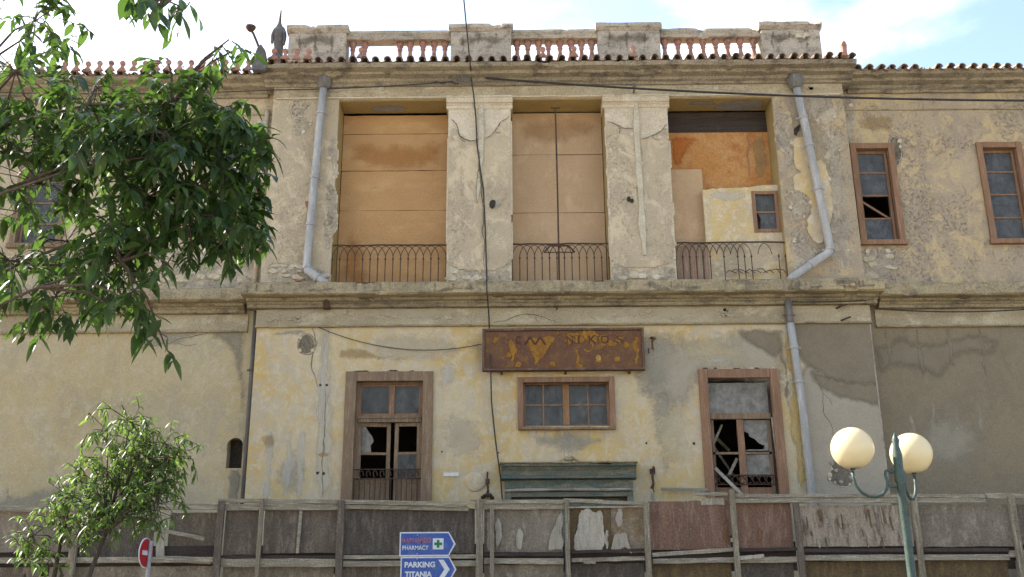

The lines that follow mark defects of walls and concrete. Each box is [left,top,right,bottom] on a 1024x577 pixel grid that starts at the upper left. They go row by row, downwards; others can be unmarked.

spalling [152,99,333,288]
spalling [324,137,339,249]
crack [451,106,509,267]
spalling [604,121,677,280]
spalling [709,94,899,290]
damp [639,324,891,506]
spalling [827,460,856,487]